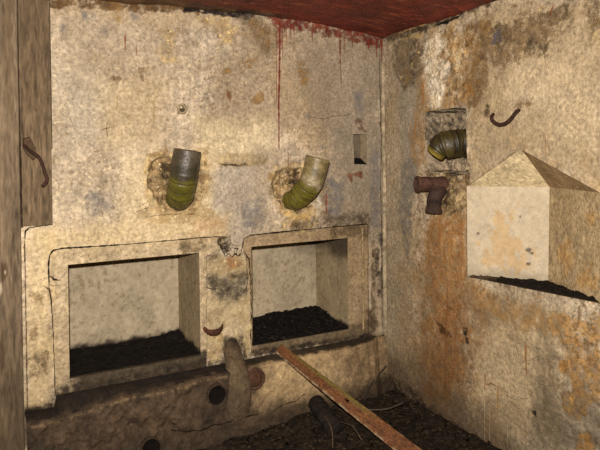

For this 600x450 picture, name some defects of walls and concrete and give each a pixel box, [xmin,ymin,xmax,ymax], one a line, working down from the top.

rust [268,17,383,148]
leakage [465,3,573,106]
flaking render [139,148,213,224]
flaking render [267,161,328,231]
rust [421,214,473,400]